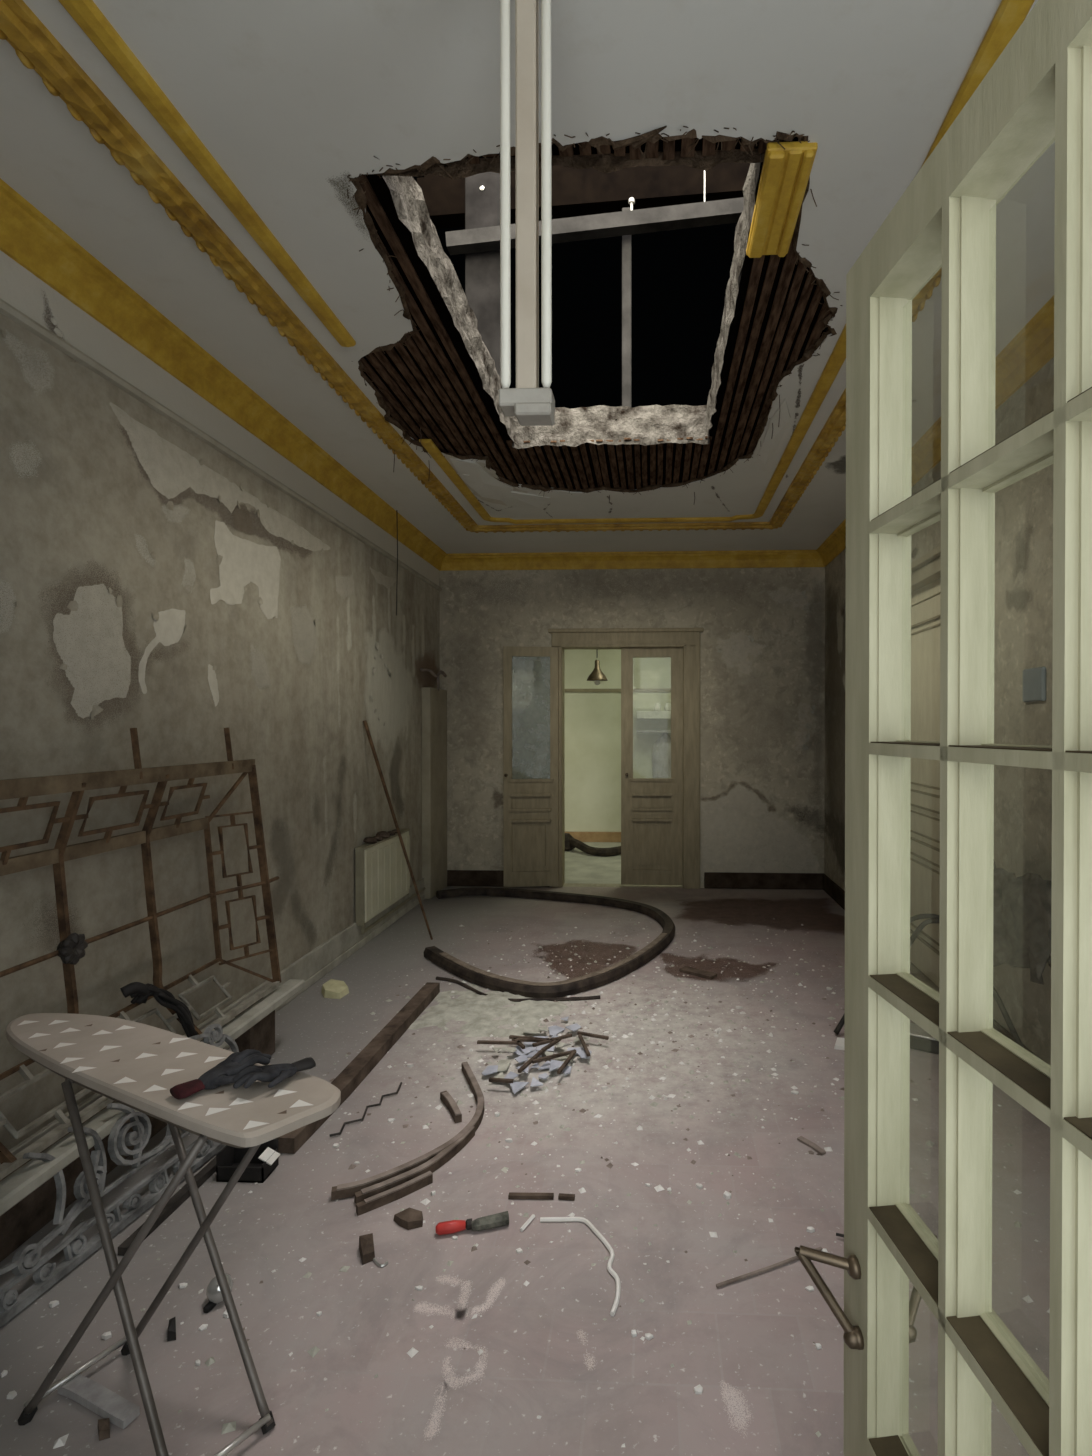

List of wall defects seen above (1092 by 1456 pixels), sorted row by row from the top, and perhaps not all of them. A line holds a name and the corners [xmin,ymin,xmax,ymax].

spalling [377,149,765,449]
peeling [109,402,330,622]
peeling [441,452,550,509]
peeling [757,399,790,466]
peeling [38,561,192,737]
peeling [208,664,219,707]